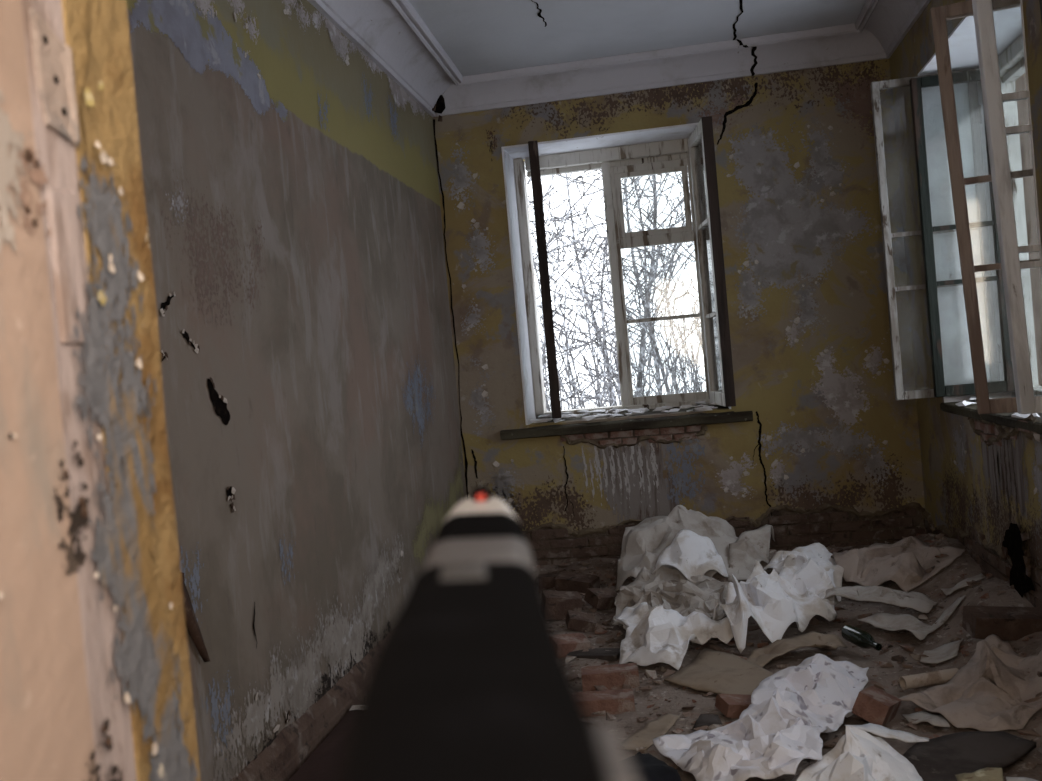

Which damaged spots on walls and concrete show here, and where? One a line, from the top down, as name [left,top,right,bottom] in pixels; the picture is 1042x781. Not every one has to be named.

peeling [128,0,289,122]
crack [531,0,547,27]
crack [717,0,758,145]
spalling [207,377,230,425]
peeling [806,339,891,428]
water stain [468,440,682,532]
crack [752,411,772,516]
flaking render [525,519,643,566]
flaking render [724,502,1042,608]
peeling [209,446,465,781]